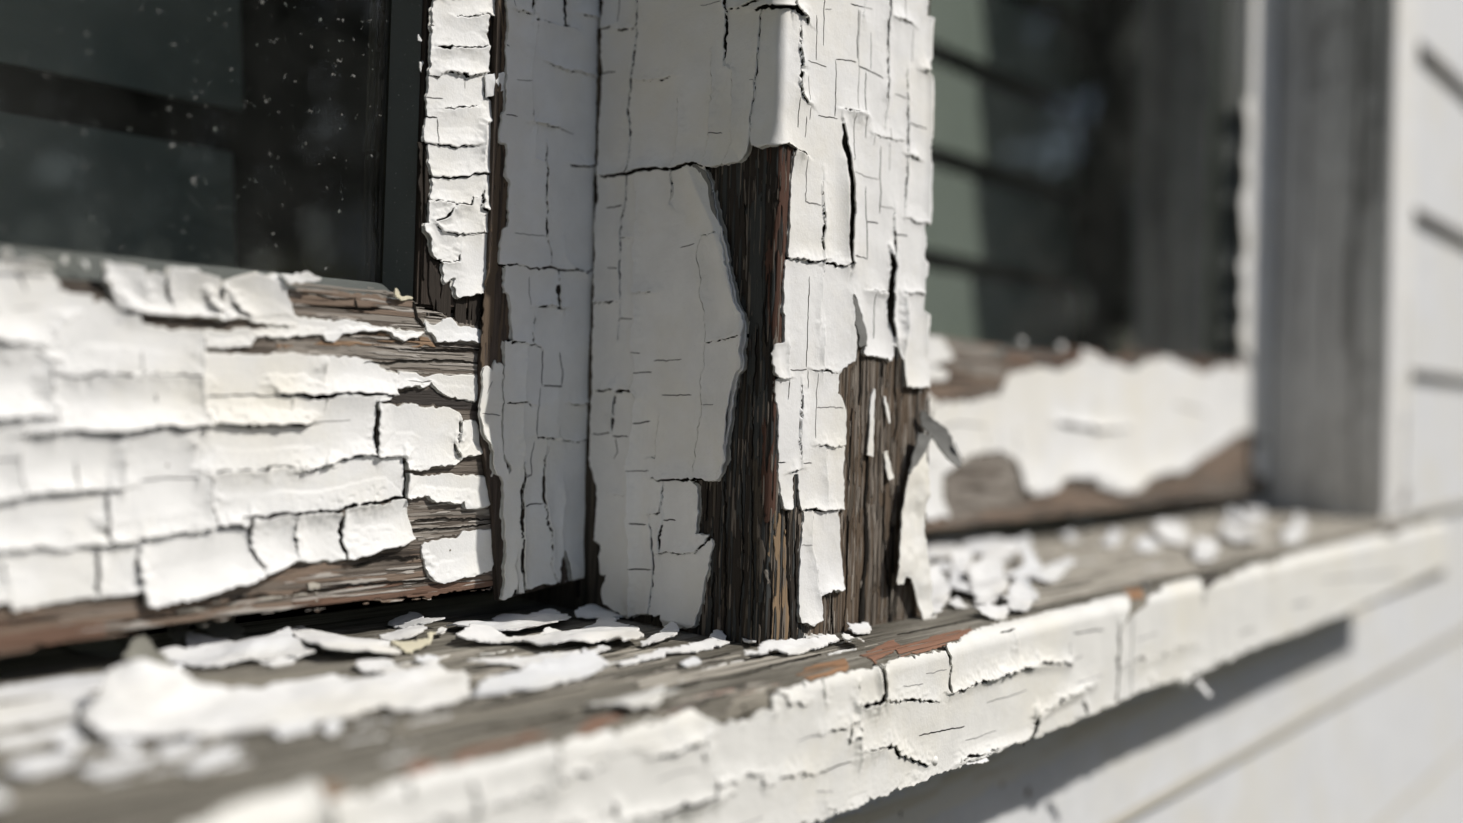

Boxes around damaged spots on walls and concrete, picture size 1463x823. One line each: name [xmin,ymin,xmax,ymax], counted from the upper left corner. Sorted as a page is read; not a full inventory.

peeling [0,249,55,270]
peeling [148,315,249,327]
crack [0,272,432,607]
peeling [0,473,730,819]
peeling [274,142,491,409]
crack [423,0,749,593]
peeling [661,684,779,724]
crack [700,0,927,472]
crack [799,509,837,546]
peeling [446,0,1276,710]
crack [612,629,1180,823]
peeling [996,500,1399,625]